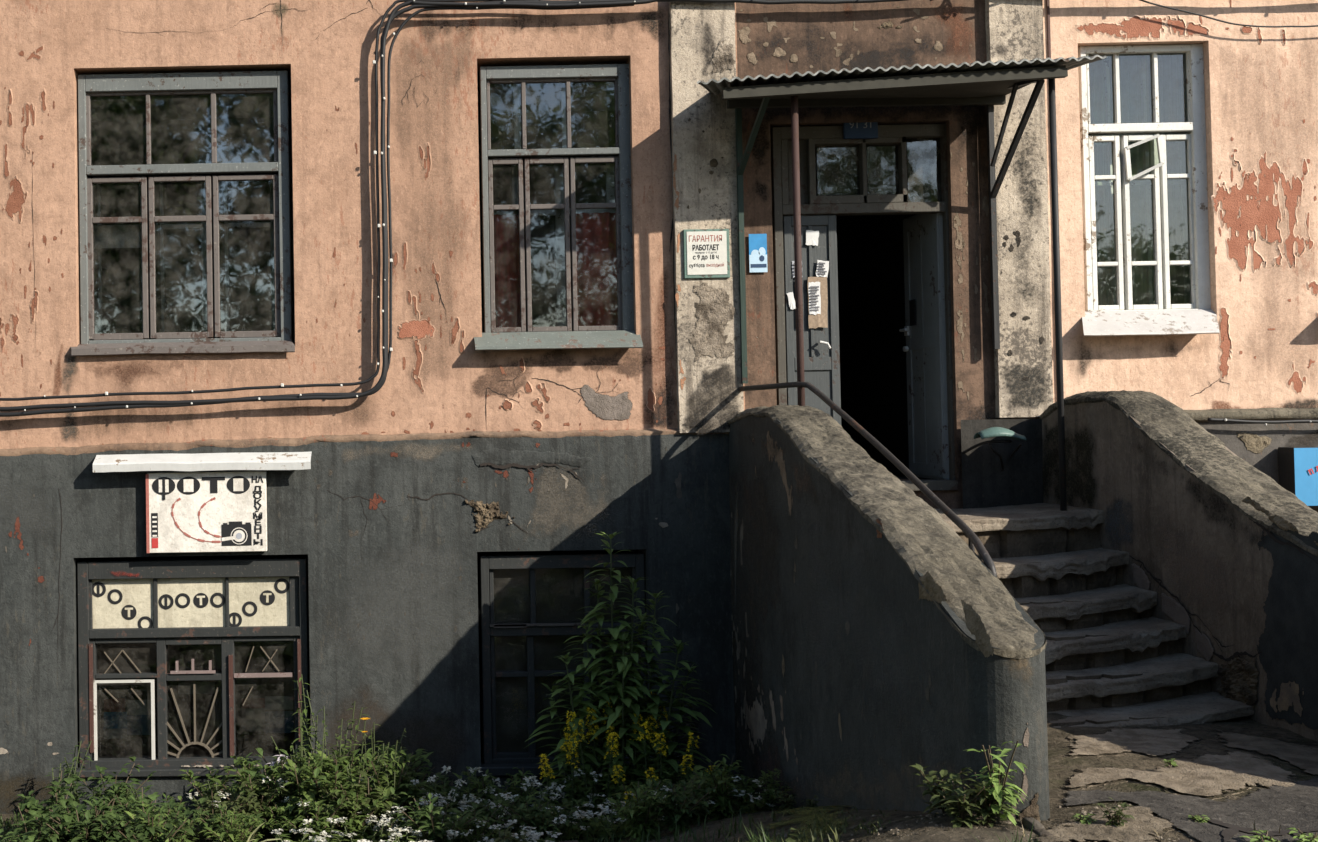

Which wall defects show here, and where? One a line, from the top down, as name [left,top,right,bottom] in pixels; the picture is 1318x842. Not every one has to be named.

peeling [1075,14,1210,41]
peeling [1226,26,1263,45]
peeling [0,87,55,224]
peeling [1211,137,1317,281]
peeling [0,263,64,367]
peeling [392,241,466,394]
peeling [485,356,551,493]
spalling [564,379,675,426]
spalling [659,283,737,390]
peeling [1285,359,1315,395]
peeling [1306,280,1318,296]
spalling [464,470,515,532]